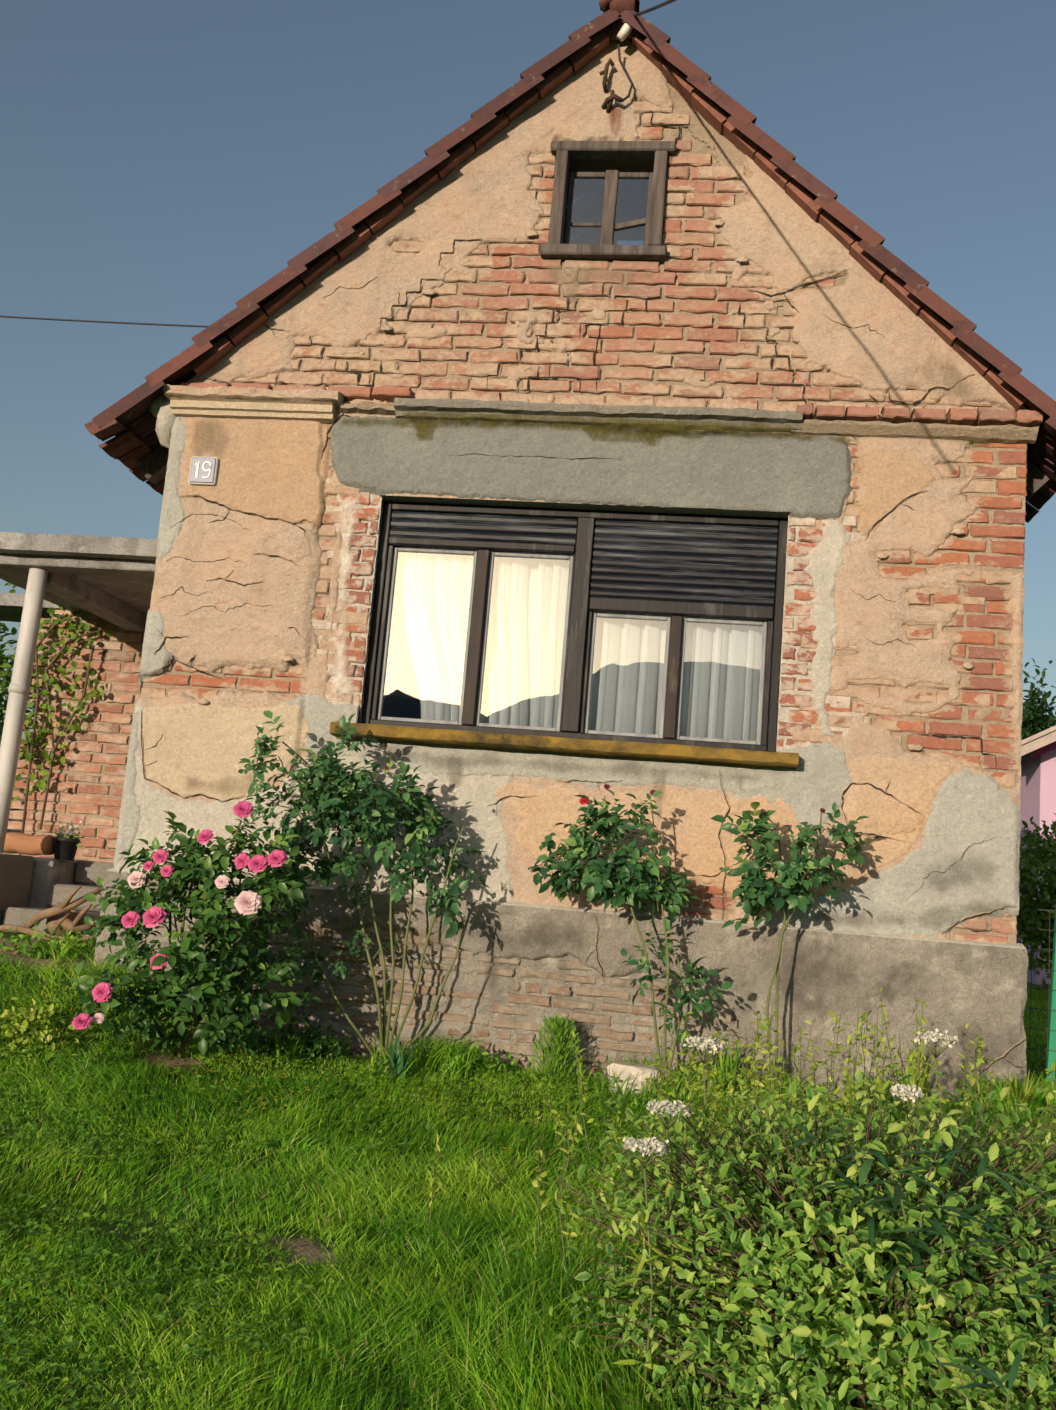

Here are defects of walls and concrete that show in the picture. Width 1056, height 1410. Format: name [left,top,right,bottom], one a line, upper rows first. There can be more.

spalling [233,83,1006,424]
crack [738,269,884,404]
crack [869,374,973,405]
crack [142,494,318,680]
spalling [495,441,1028,920]
crack [141,716,244,802]
crack [841,781,926,845]
crack [914,839,990,893]
crack [943,905,1012,932]
flaking render [228,922,749,1084]